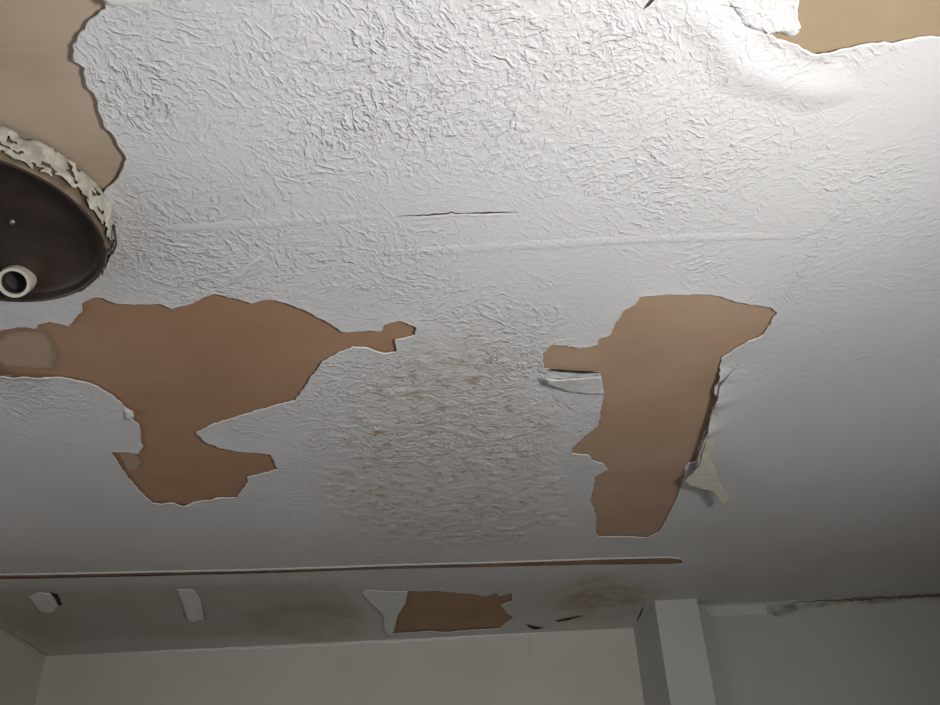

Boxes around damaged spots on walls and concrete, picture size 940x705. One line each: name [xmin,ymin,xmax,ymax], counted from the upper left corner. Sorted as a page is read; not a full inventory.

peeling [0,0,156,194]
peeling [728,0,940,57]
peeling [0,293,418,507]
peeling [541,293,778,538]
peeling [361,589,515,637]